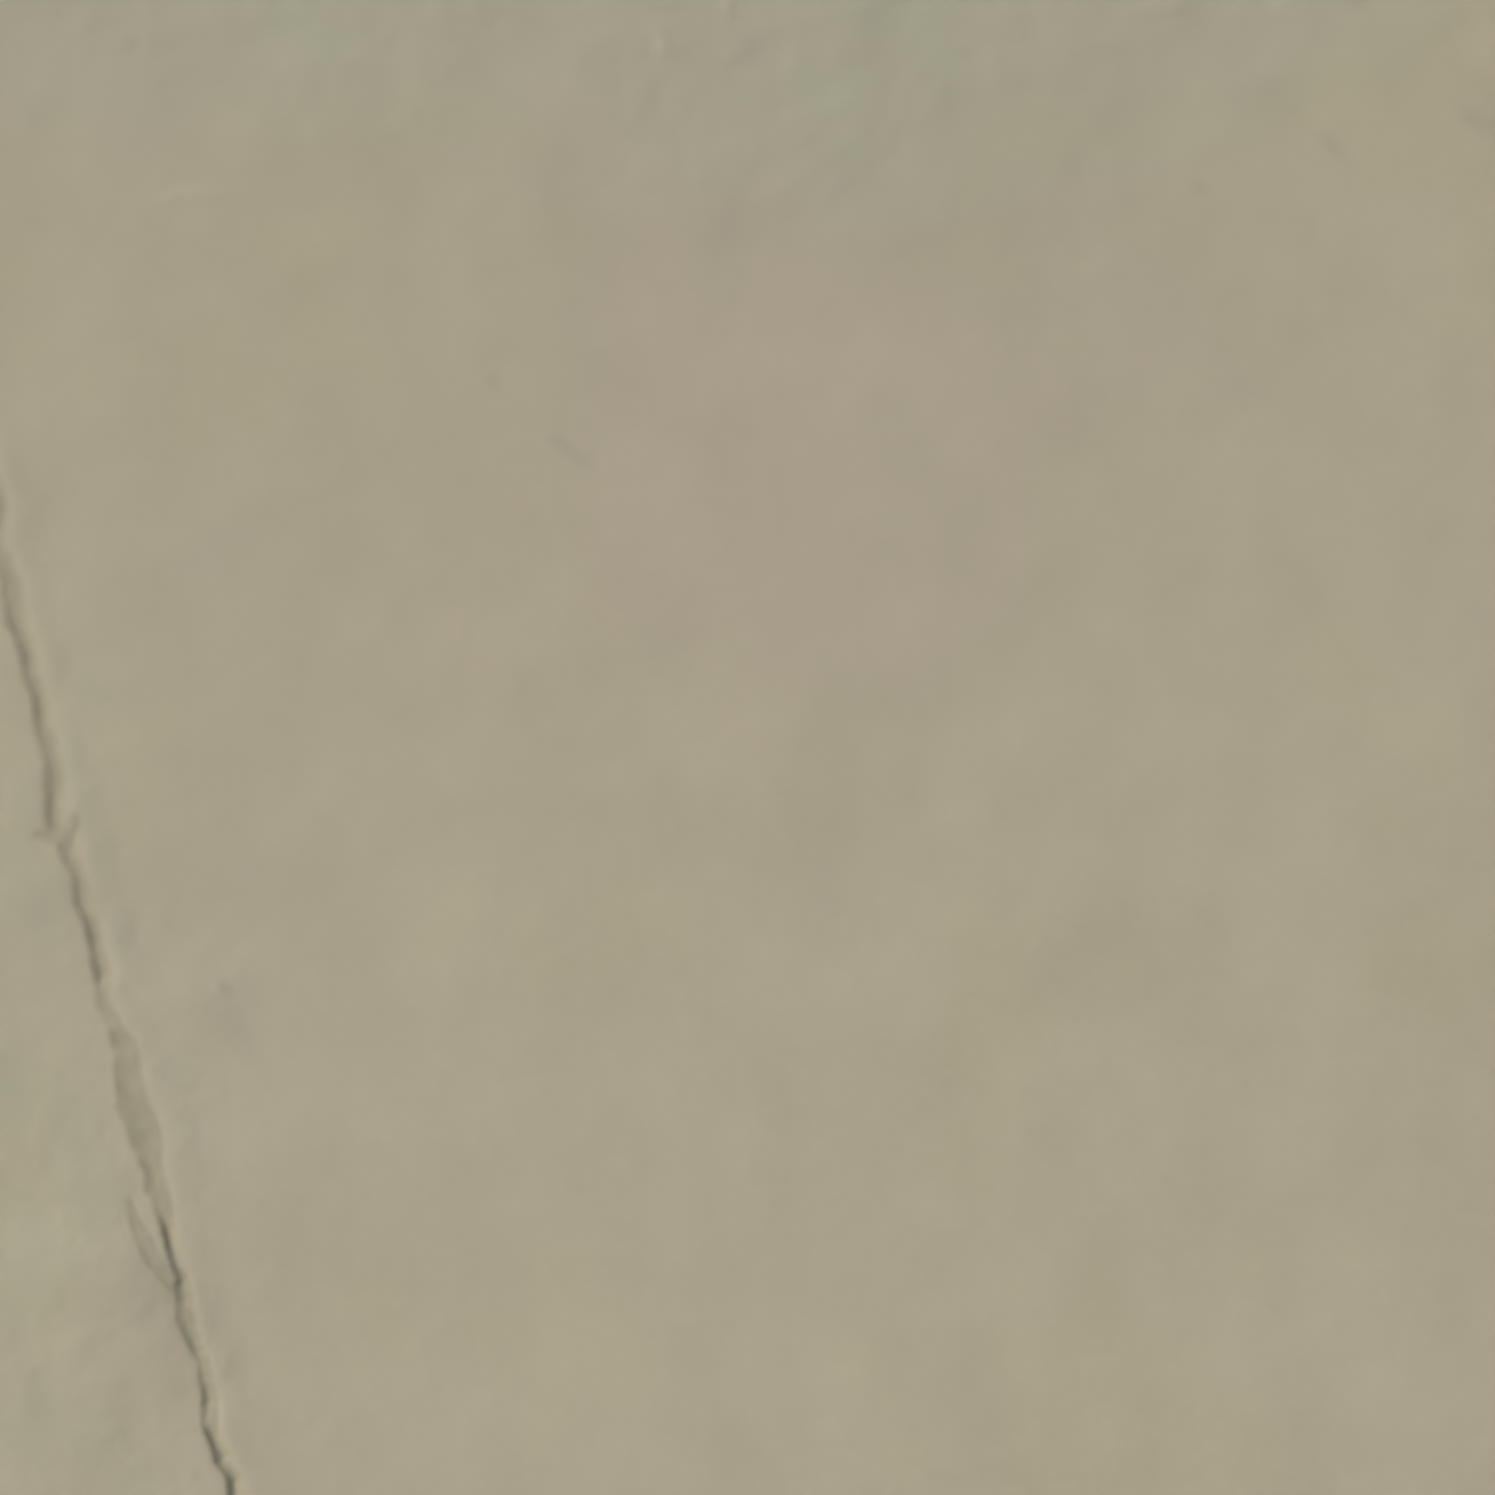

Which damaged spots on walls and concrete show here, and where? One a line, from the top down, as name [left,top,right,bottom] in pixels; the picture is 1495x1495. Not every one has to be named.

crack [0,480,243,1495]